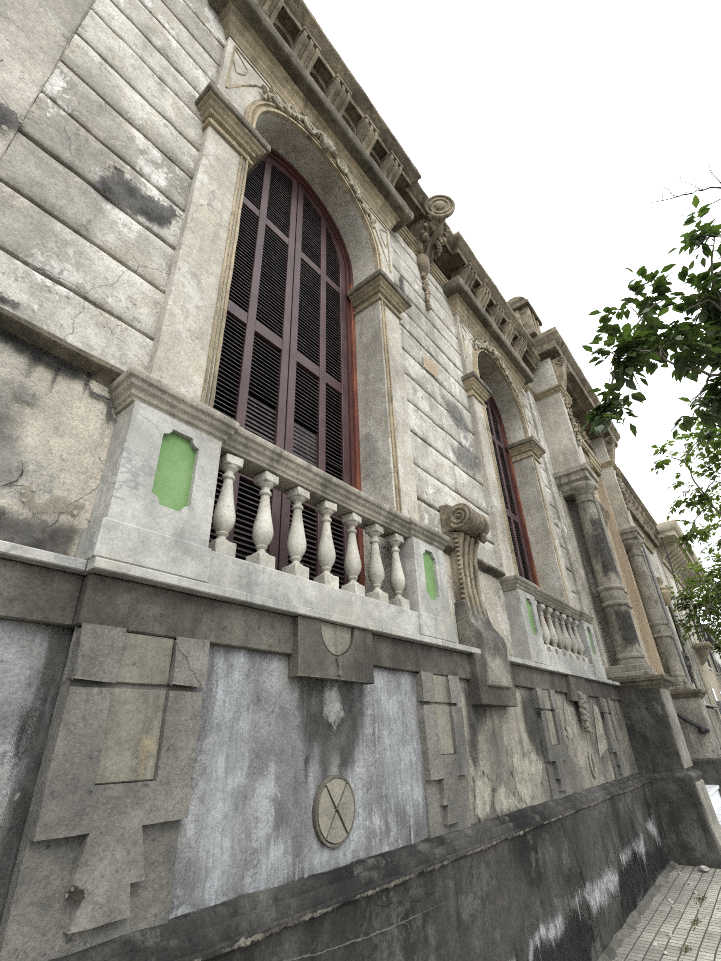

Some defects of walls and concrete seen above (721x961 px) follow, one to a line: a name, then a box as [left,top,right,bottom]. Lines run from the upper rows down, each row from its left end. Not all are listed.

leakage [0,507,80,556]
leakage [300,679,365,780]
leakage [376,676,422,844]
spalling [65,885,88,902]
crack [283,906,436,961]
leakage [529,819,668,961]